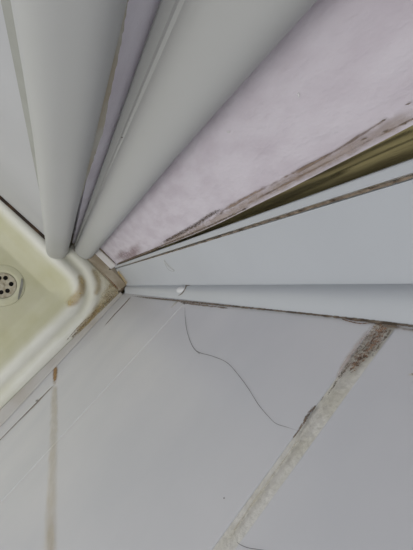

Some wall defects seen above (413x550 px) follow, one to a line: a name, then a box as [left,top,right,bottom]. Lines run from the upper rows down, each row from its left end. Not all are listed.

damp [99,119,413,266]
crack [185,320,285,427]